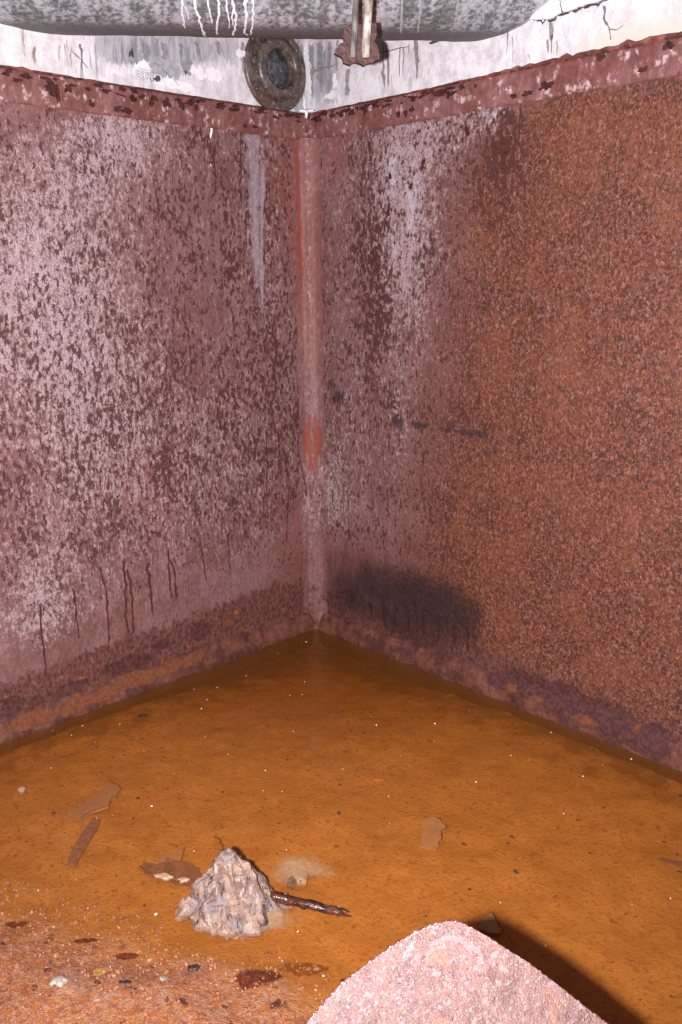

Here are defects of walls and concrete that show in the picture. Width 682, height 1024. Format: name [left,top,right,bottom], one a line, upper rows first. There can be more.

leakage [133,0,255,71]
crack [534,0,623,40]
corrosion [1,68,241,115]
corrosion [510,81,554,99]
corrosion [240,83,477,210]
efflorescence [247,134,265,305]
corrosion [39,603,47,677]
corrosion [99,567,110,644]
corrosion [0,621,209,733]
corrosion [122,562,135,635]
corrosion [167,550,177,599]
leakage [337,565,475,644]